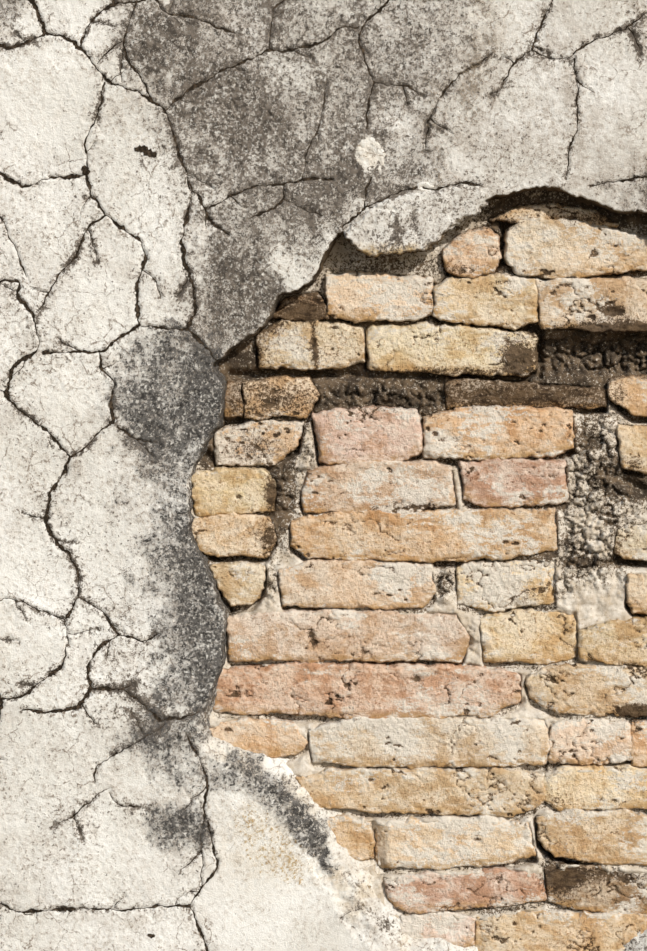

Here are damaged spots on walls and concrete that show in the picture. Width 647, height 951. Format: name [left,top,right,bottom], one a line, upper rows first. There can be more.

crack [342,177,480,228]
crack [425,0,647,176]
crack [590,176,647,187]
crack [0,0,423,842]
damp [93,0,499,853]
spalling [188,182,647,951]
crack [0,735,219,951]